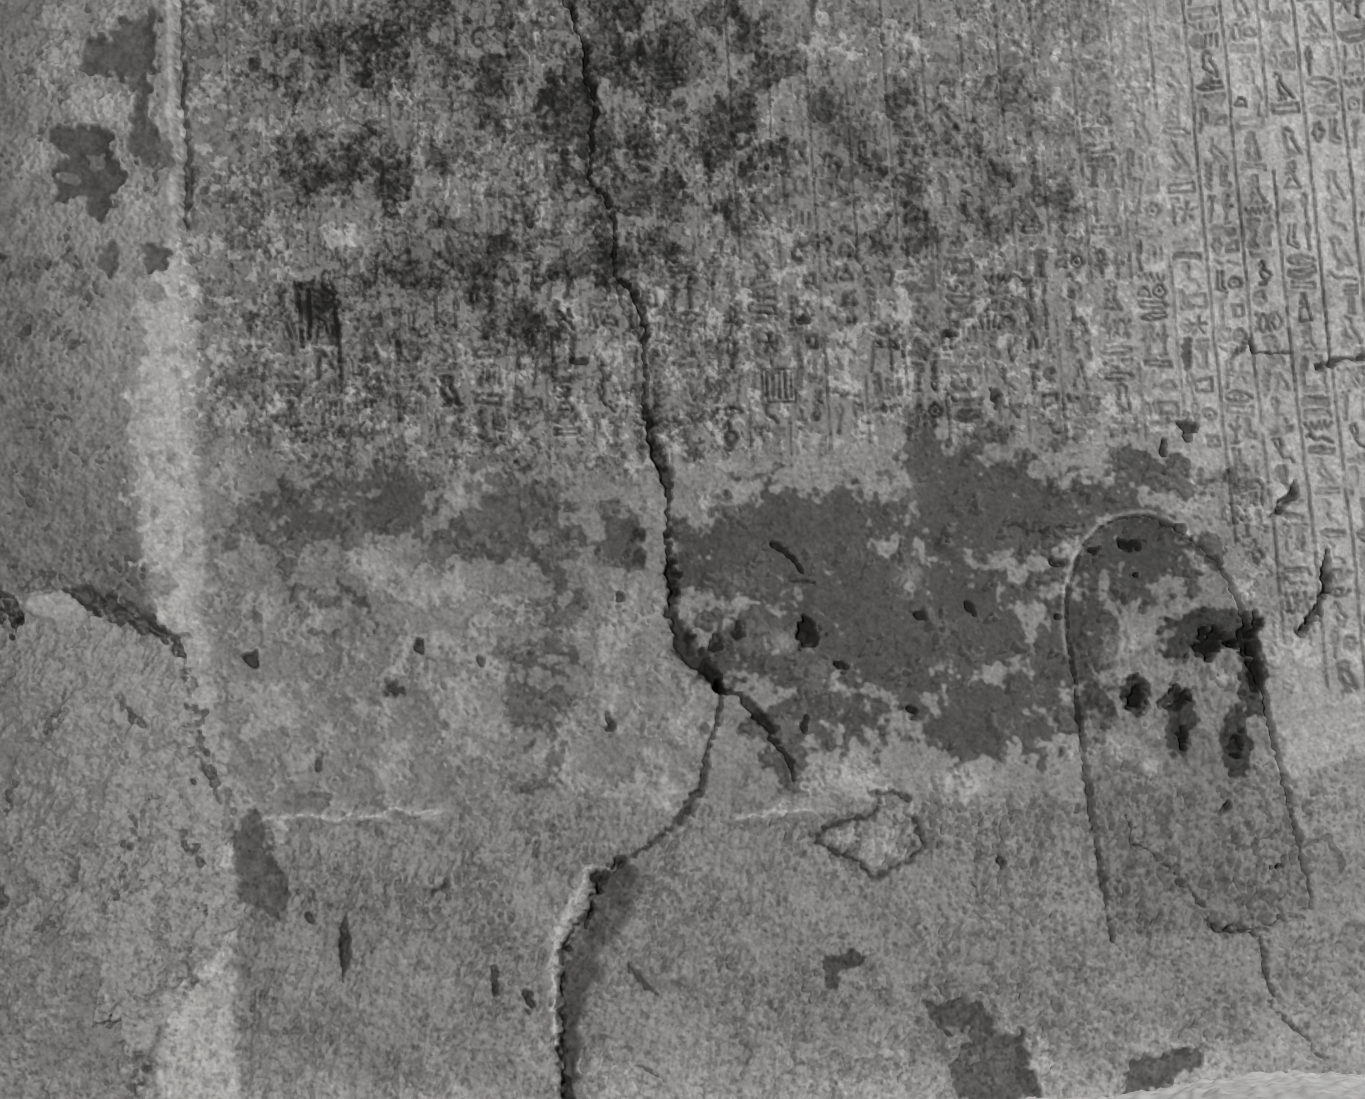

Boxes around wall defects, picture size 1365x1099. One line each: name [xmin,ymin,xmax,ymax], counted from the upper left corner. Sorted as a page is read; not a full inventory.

crack [0,588,25,641]
crack [61,578,225,810]
crack [552,0,798,1099]
damp [204,370,1281,802]